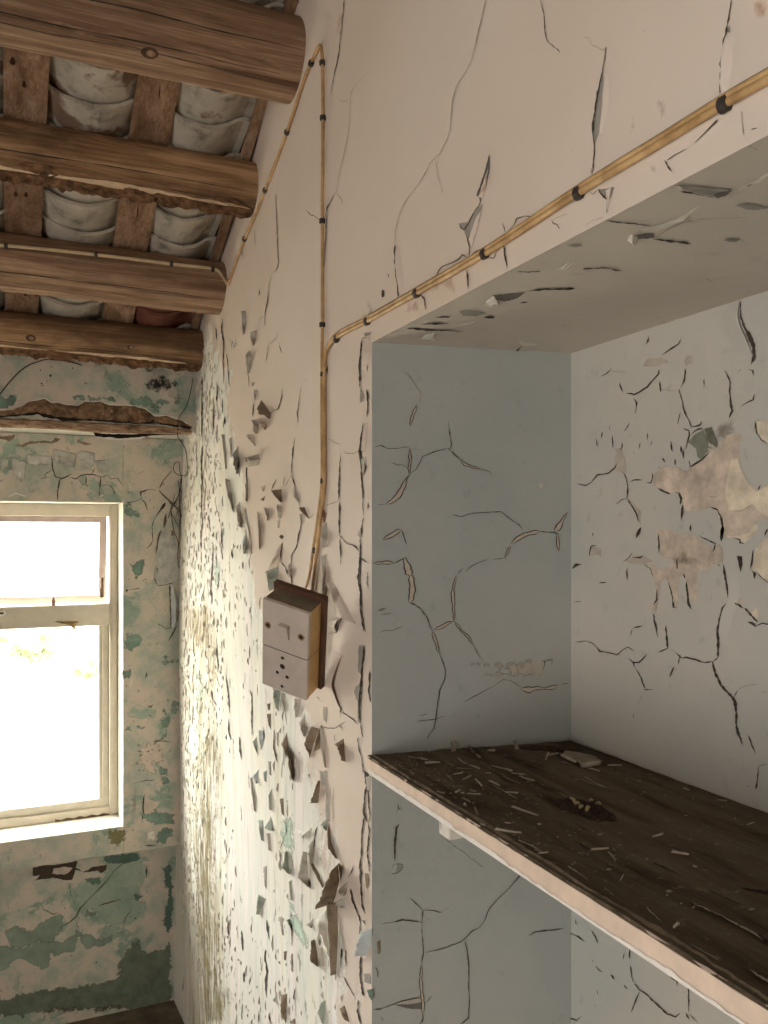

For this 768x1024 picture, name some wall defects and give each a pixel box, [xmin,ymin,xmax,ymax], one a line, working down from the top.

crack [582,36,610,173]
spalling [0,311,314,601]
mould [147,376,177,392]
peeling [321,332,372,632]
crack [577,279,756,561]
crack [373,511,568,740]
crack [580,507,768,789]
peeling [0,864,174,1018]
peeling [33,701,179,885]
mould [108,828,126,847]
peeling [250,646,421,1024]
crack [529,921,695,1020]